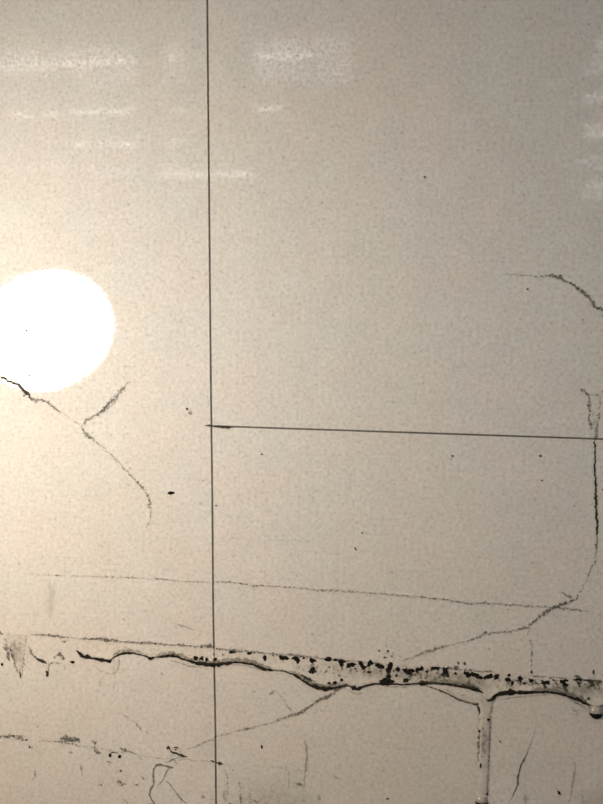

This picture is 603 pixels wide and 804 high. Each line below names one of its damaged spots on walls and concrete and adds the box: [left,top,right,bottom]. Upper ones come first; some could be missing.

crack [523,274,603,316]
crack [0,376,60,412]
crack [82,388,124,439]
crack [420,389,601,656]
leakage [475,700,494,804]